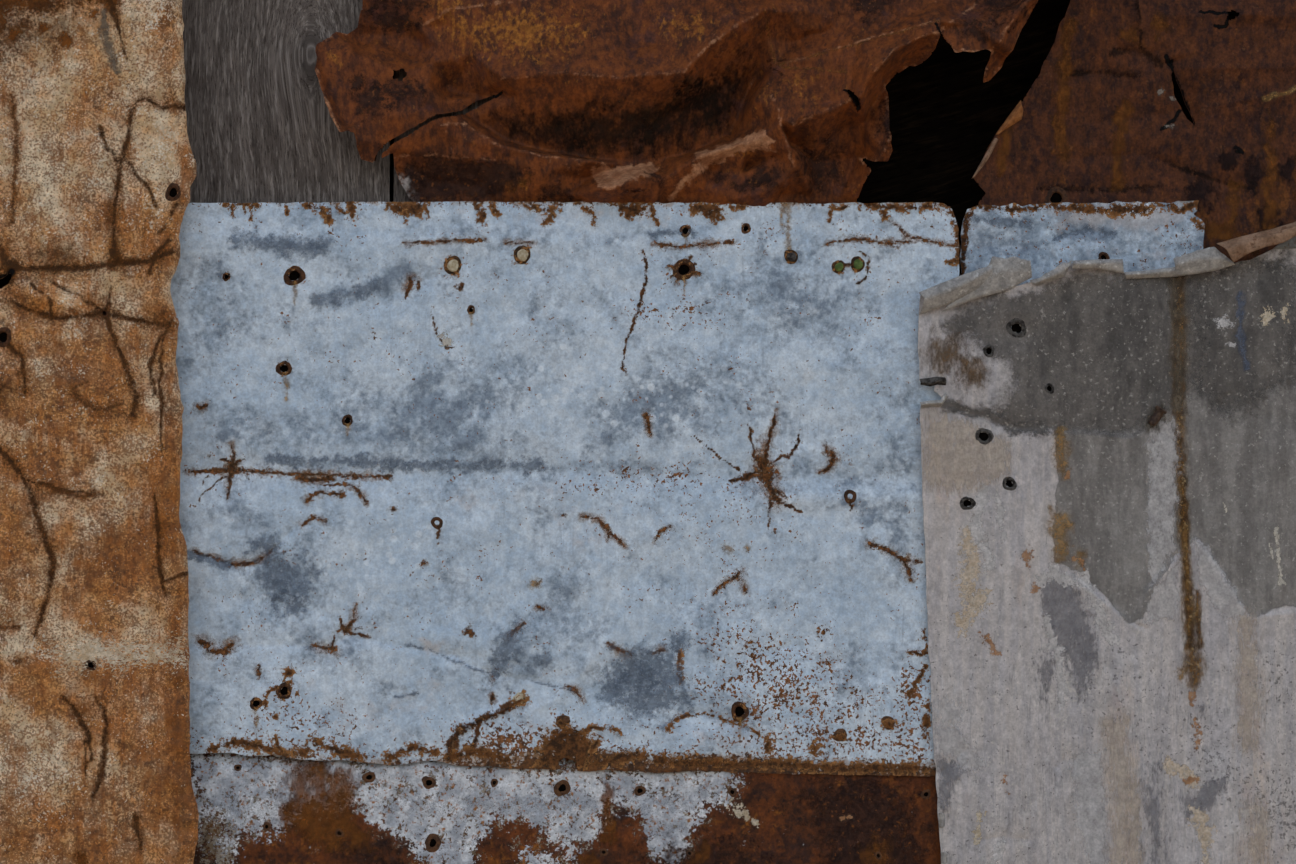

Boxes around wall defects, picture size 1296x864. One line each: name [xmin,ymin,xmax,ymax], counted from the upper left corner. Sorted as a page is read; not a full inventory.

corrosion [0,0,124,60]
corrosion [496,49,748,158]
corrosion [610,0,1296,291]
crack [1160,54,1195,131]
corrosion [222,203,262,221]
corrosion [284,201,358,227]
corrosion [377,152,533,292]
corrosion [523,180,598,227]
corrosion [694,408,803,527]
corrosion [1145,276,1204,750]
corrosion [190,628,941,864]
peeling [190,753,759,864]